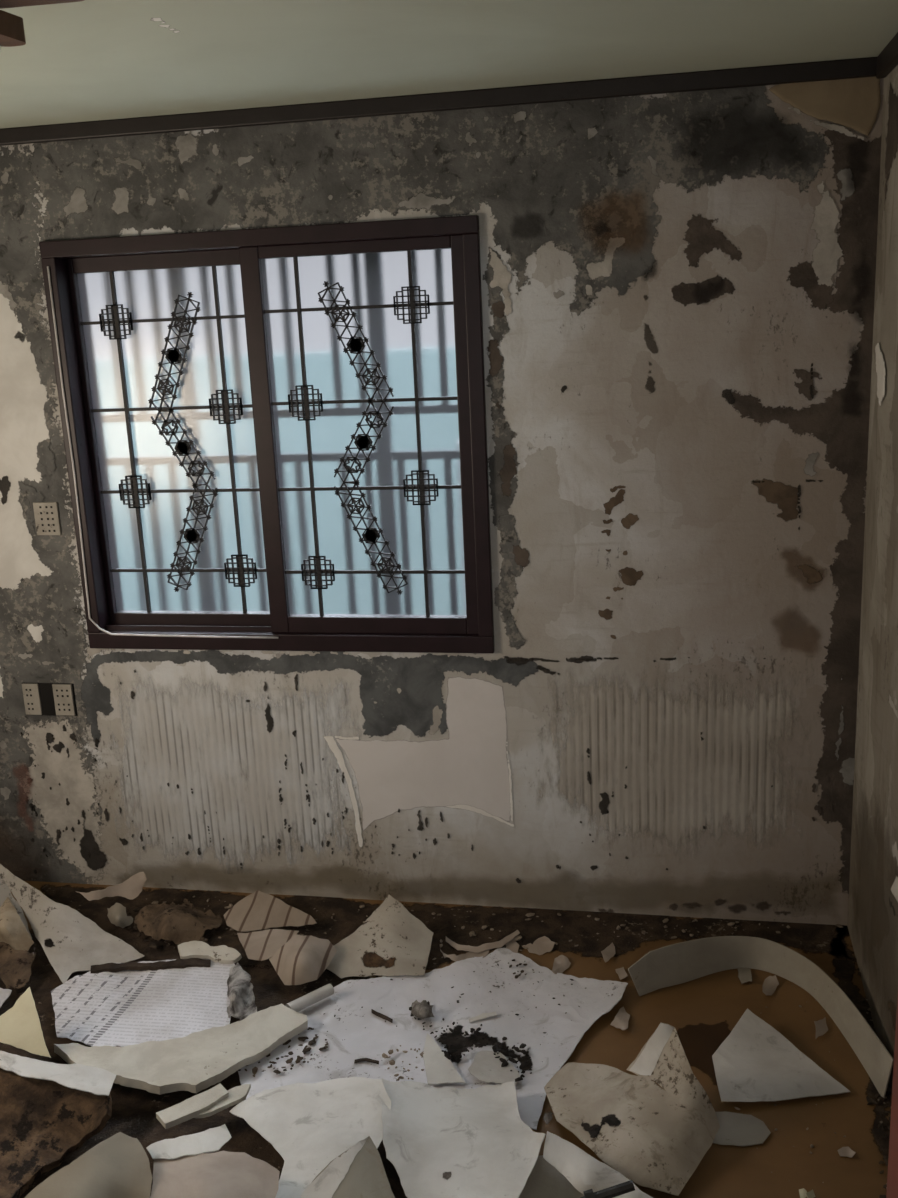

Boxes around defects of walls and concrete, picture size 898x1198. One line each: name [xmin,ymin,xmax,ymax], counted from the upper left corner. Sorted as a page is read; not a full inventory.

peeling [0,77,898,894]
leakage [0,717,150,884]
flaking render [889,841,898,916]